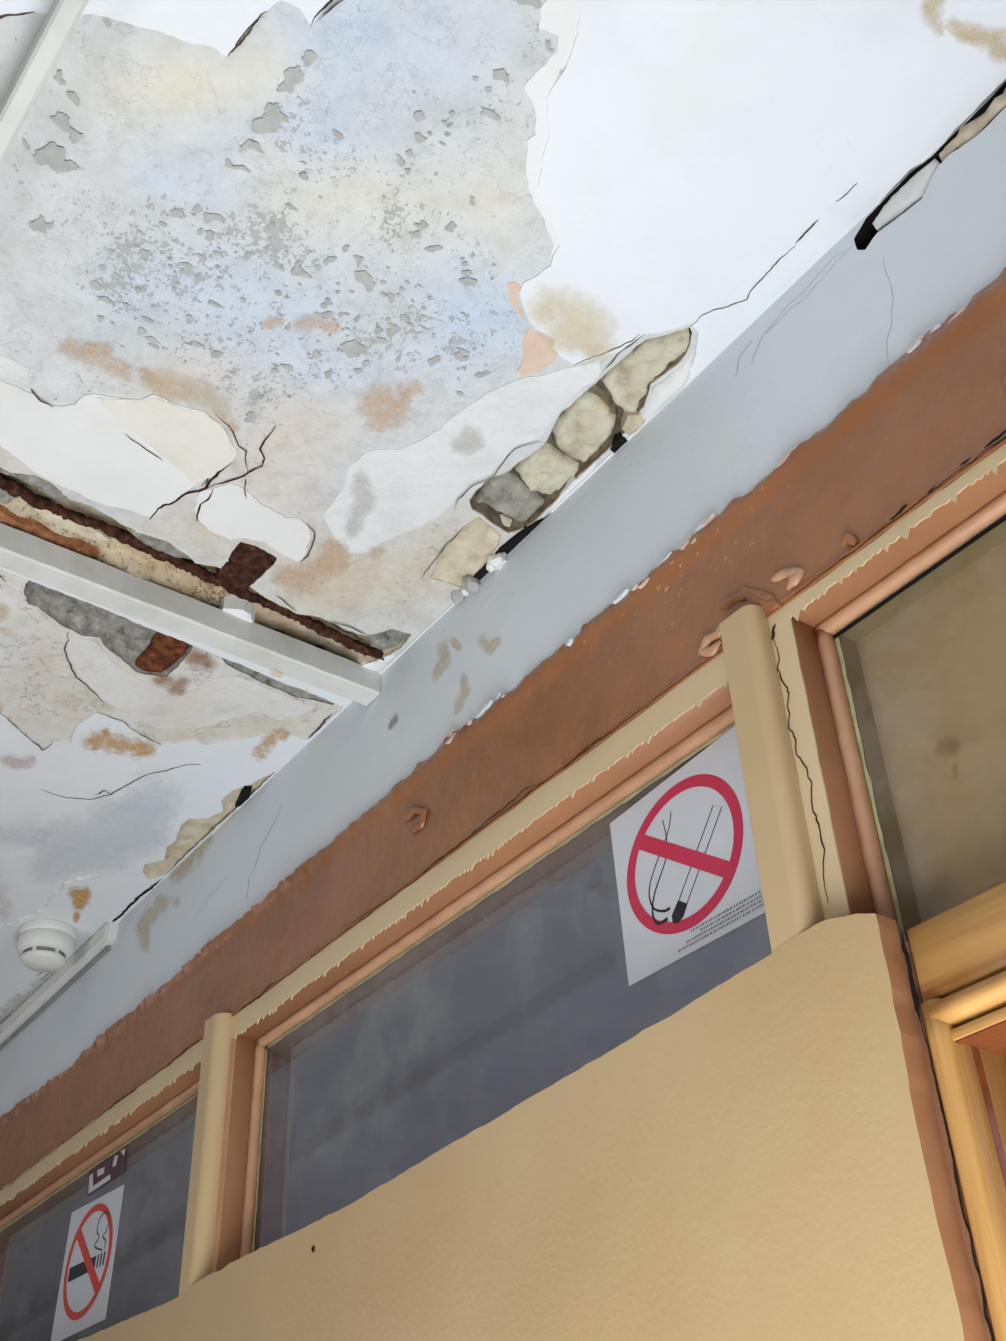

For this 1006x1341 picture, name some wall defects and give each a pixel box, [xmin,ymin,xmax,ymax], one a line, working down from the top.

damp [957,27,1006,56]
peeling [0,0,698,673]
peeling [906,306,966,353]
peeling [613,513,717,604]
crack [794,430,1006,595]
crack [41,632,201,800]
peeling [0,568,343,750]
crack [112,772,282,922]
spalling [143,772,274,879]
crack [239,659,708,1010]
peeling [444,693,505,745]
crack [771,624,828,903]